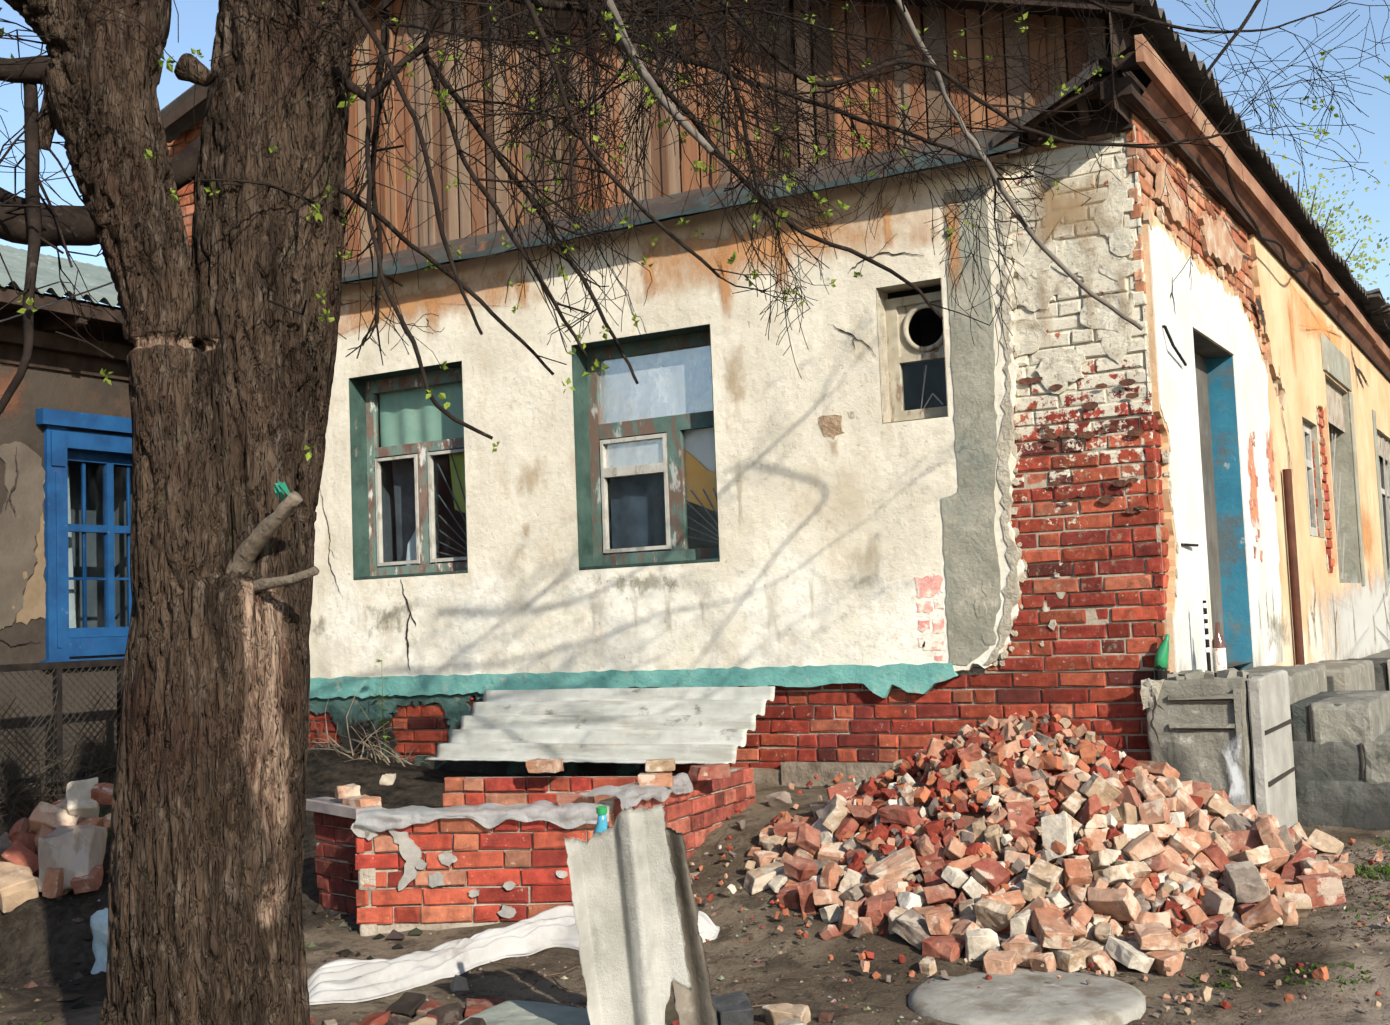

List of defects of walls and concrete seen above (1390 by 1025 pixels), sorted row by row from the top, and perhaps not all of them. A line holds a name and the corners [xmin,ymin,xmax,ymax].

corrosion [644,205,891,307]
corrosion [947,210,958,270]
corrosion [341,270,527,331]
flaking render [818,411,855,439]
flaking render [984,113,1286,710]
flaking render [0,441,46,630]
crack [401,582,416,669]
flaking render [391,699,451,762]
flaking render [466,692,483,715]